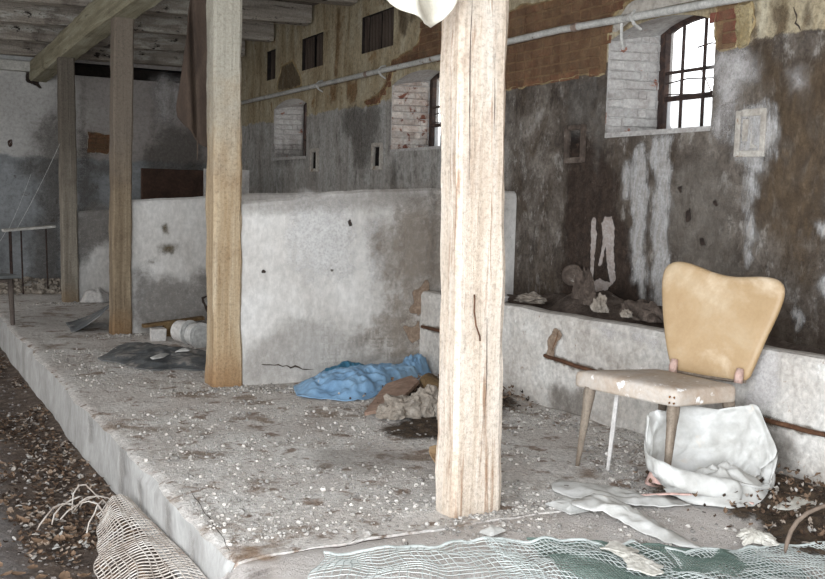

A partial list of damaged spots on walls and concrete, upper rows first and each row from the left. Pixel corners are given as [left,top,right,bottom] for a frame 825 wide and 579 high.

flaking render [364,20,442,107]
flaking render [505,0,633,91]
flaking render [709,1,756,52]
flaking render [87,131,110,155]
water stain [713,52,825,277]
crack [262,363,311,371]